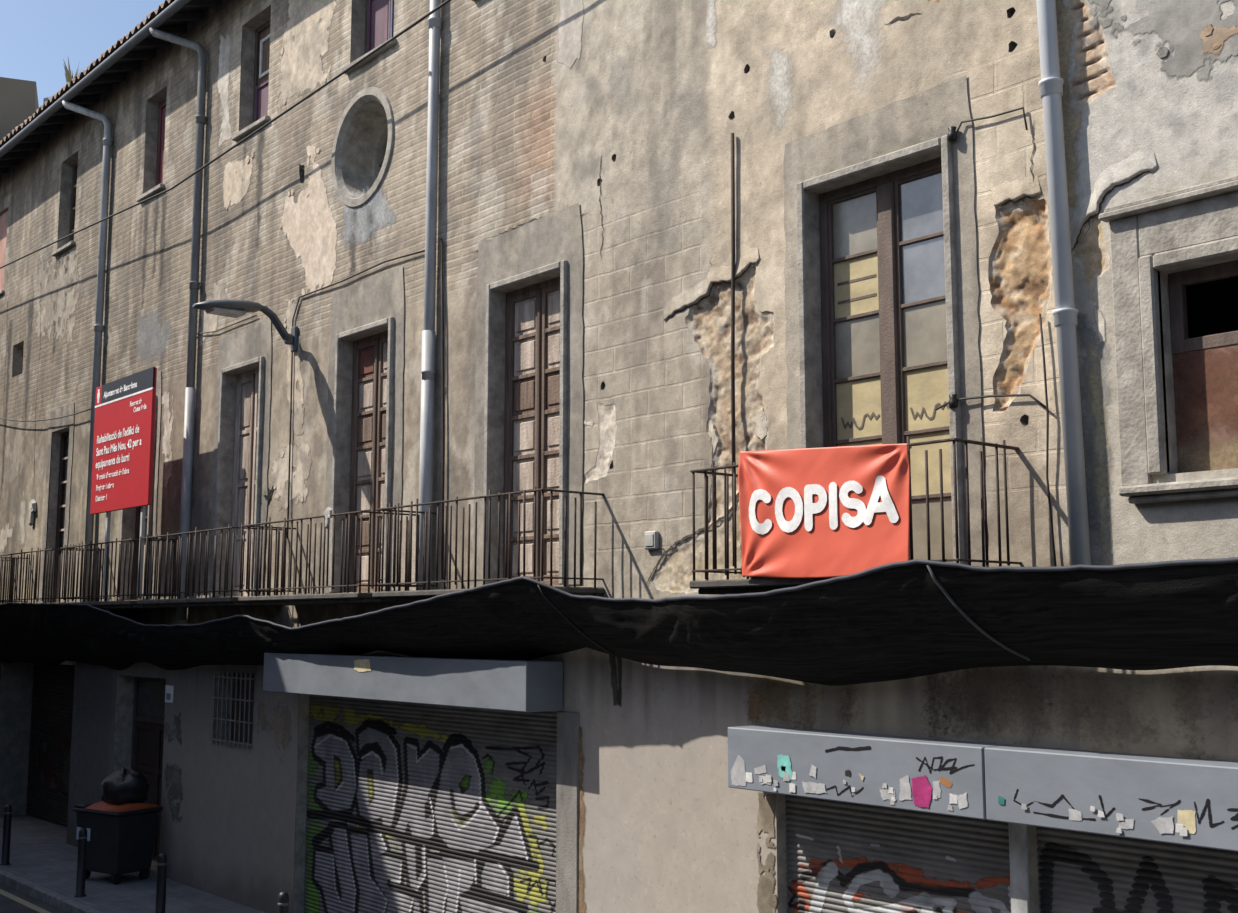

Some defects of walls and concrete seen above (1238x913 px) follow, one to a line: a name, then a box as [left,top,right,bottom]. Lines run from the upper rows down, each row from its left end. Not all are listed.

flaking render [217,31,232,147]
spalling [886,0,940,25]
flaking render [1063,0,1117,114]
flaking render [1200,24,1238,55]
flaking render [223,152,254,210]
damp [349,200,373,272]
crack [475,154,604,255]
crack [991,123,1042,215]
crack [1070,147,1162,251]
flaking render [270,145,337,510]
flaking render [988,198,1052,413]
flaking render [651,266,775,594]